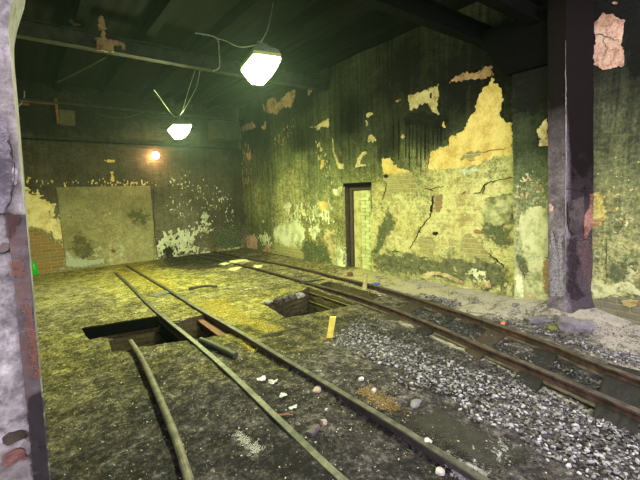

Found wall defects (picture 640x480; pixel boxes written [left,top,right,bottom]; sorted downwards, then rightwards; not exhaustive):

peeling [593,13,625,70]
peeling [262,90,296,115]
peeling [395,85,439,115]
leakage [393,116,446,170]
peeling [427,65,513,172]
peeling [537,119,548,146]
peeling [88,171,156,186]
flaking render [381,158,424,199]
crack [462,177,512,195]
flaking render [25,177,65,274]
leakage [274,198,347,267]
crack [392,186,444,252]